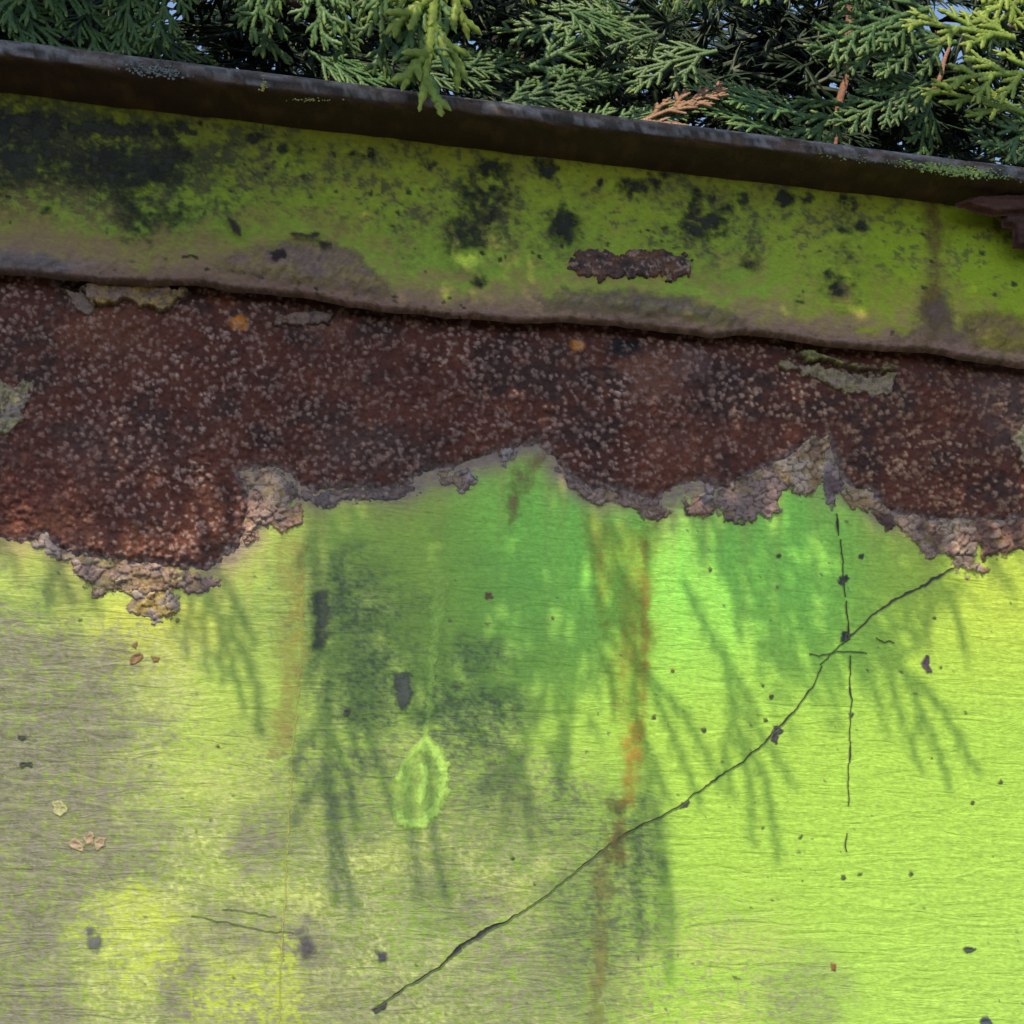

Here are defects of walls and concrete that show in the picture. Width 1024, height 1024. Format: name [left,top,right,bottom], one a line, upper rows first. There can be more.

mould [0,110,202,232]
mould [446,158,513,252]
mould [534,158,560,179]
mould [548,207,580,245]
mould [616,172,668,197]
mould [680,188,749,239]
mould [775,189,814,207]
mould [837,194,867,232]
mould [827,271,844,296]
crack [371,492,956,1014]
corrosion [606,794,633,859]